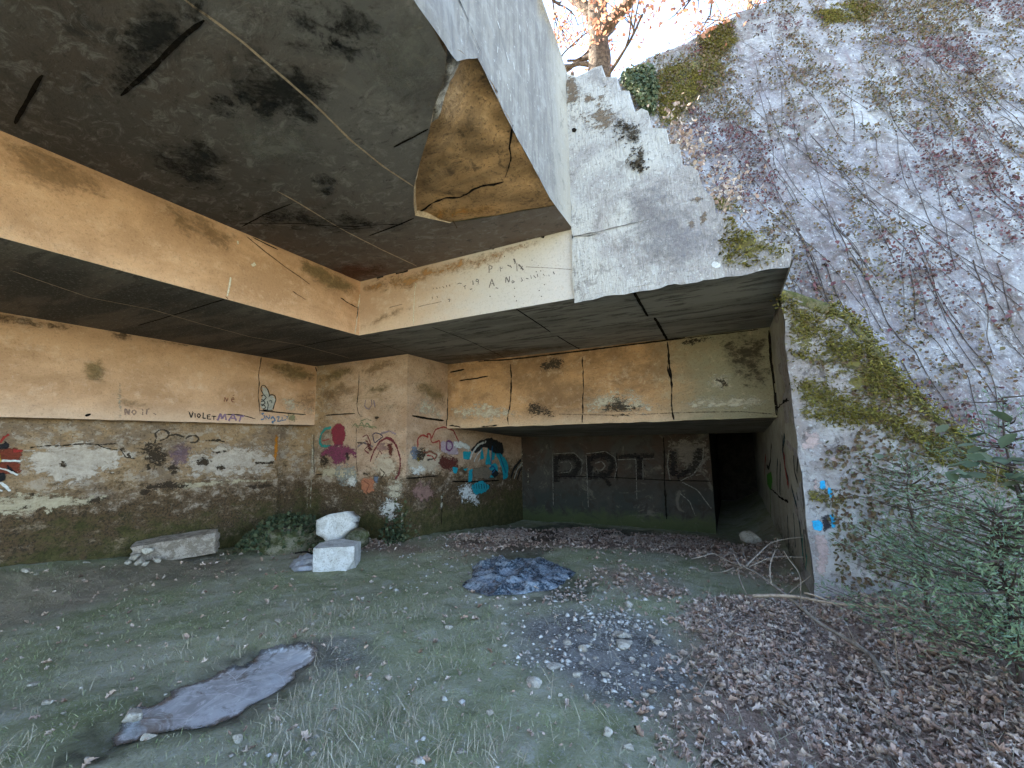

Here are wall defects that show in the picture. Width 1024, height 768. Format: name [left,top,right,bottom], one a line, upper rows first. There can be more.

water stain [210,63,329,123]
water stain [154,140,221,190]
spalling [413,45,555,223]
crack [240,129,513,300]
crack [446,364,512,428]
water stain [527,401,556,418]
water stain [587,390,653,417]
crack [567,342,790,519]
peeling [0,439,275,518]